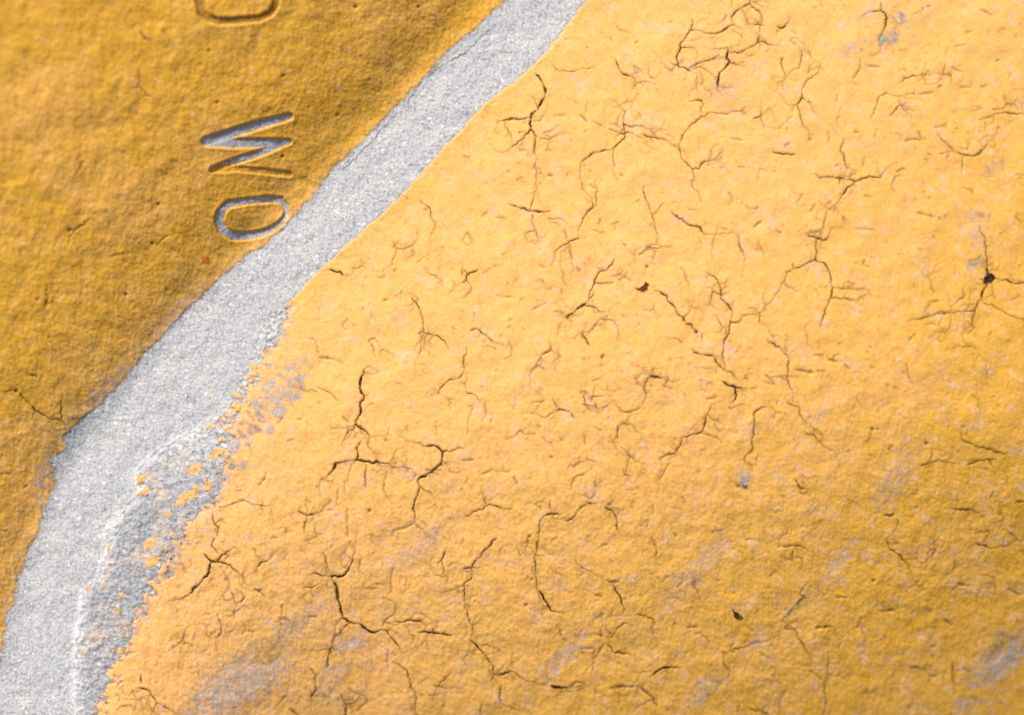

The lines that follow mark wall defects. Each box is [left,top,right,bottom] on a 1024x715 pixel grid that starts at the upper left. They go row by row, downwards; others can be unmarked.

crack [503,0,820,257]
peeling [0,0,588,715]
crack [328,338,456,518]
crack [412,298,493,402]
crack [566,260,614,346]
crack [547,370,670,476]
crack [659,139,881,469]
crack [917,230,1024,331]
crack [182,500,267,637]
crack [291,538,584,715]
crack [528,473,618,612]
crack [611,666,678,705]